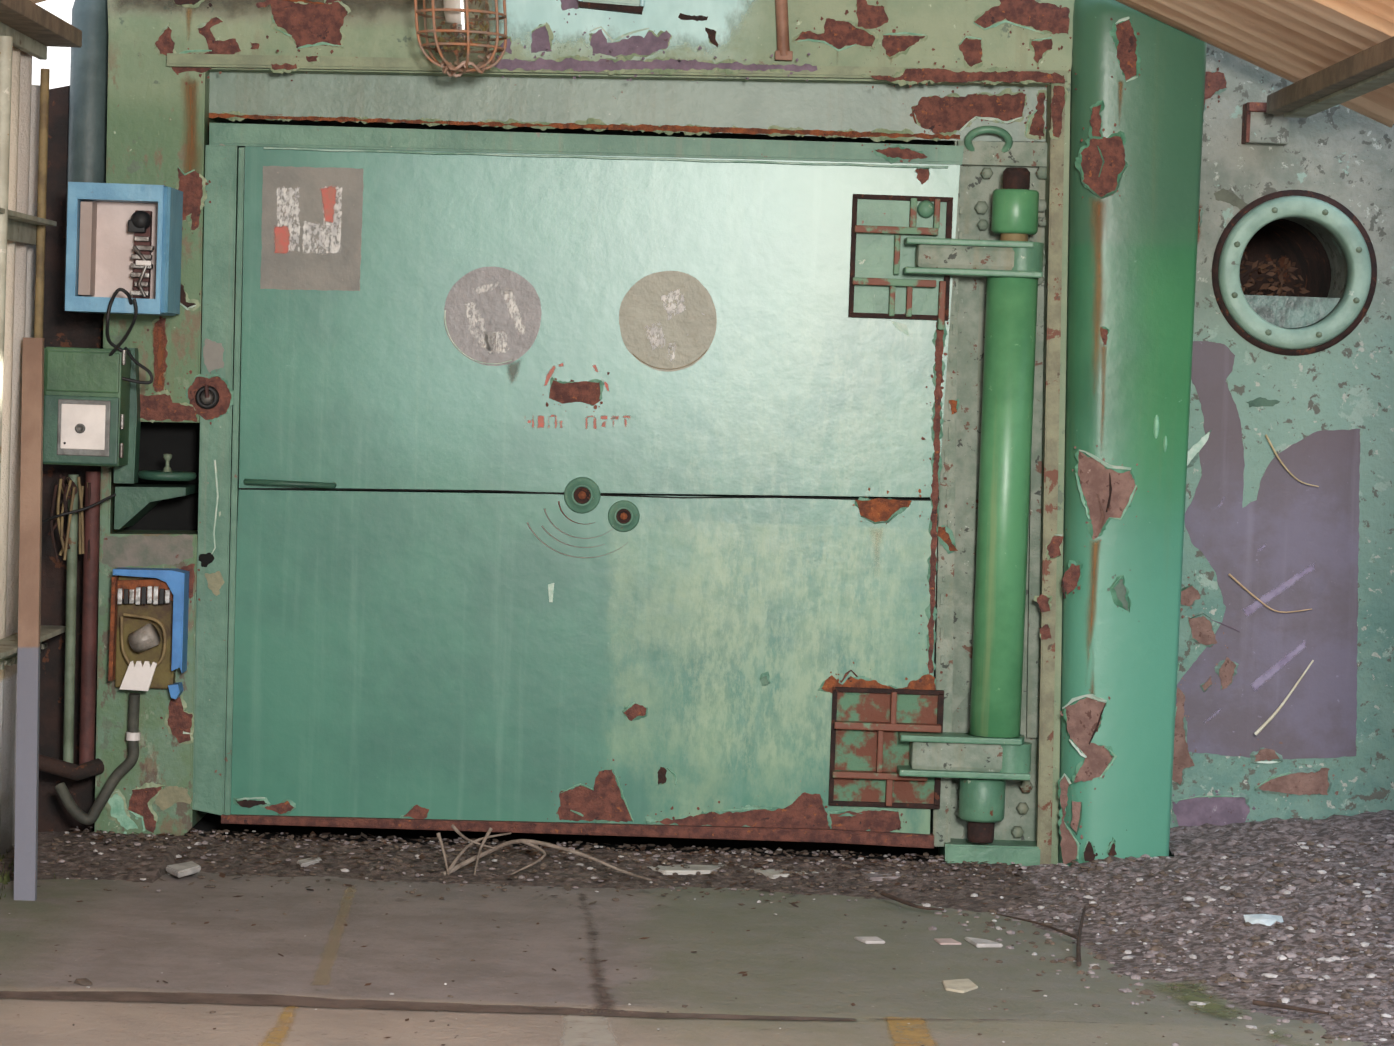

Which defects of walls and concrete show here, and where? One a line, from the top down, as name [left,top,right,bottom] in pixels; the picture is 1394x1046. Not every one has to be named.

peeling [256,0,351,54]
peeling [487,0,935,84]
peeling [974,0,1072,45]
rust [154,0,960,234]
peeling [903,86,1047,143]
peeling [1075,16,1142,352]
rust [140,316,234,425]
rust [546,372,610,412]
rust [816,321,959,697]
peeling [1039,445,1149,634]
rust [547,759,907,833]
peeling [1047,686,1127,864]